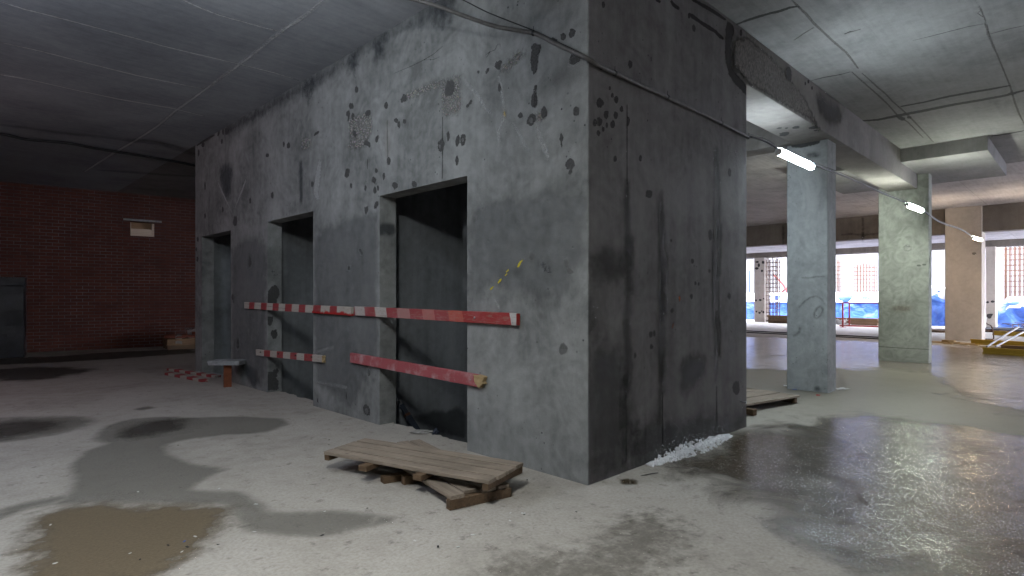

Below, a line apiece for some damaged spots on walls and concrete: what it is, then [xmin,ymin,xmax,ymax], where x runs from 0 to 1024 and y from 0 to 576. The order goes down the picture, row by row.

spalling [725,22,746,95]
water stain [591,149,743,477]
water stain [0,407,388,576]